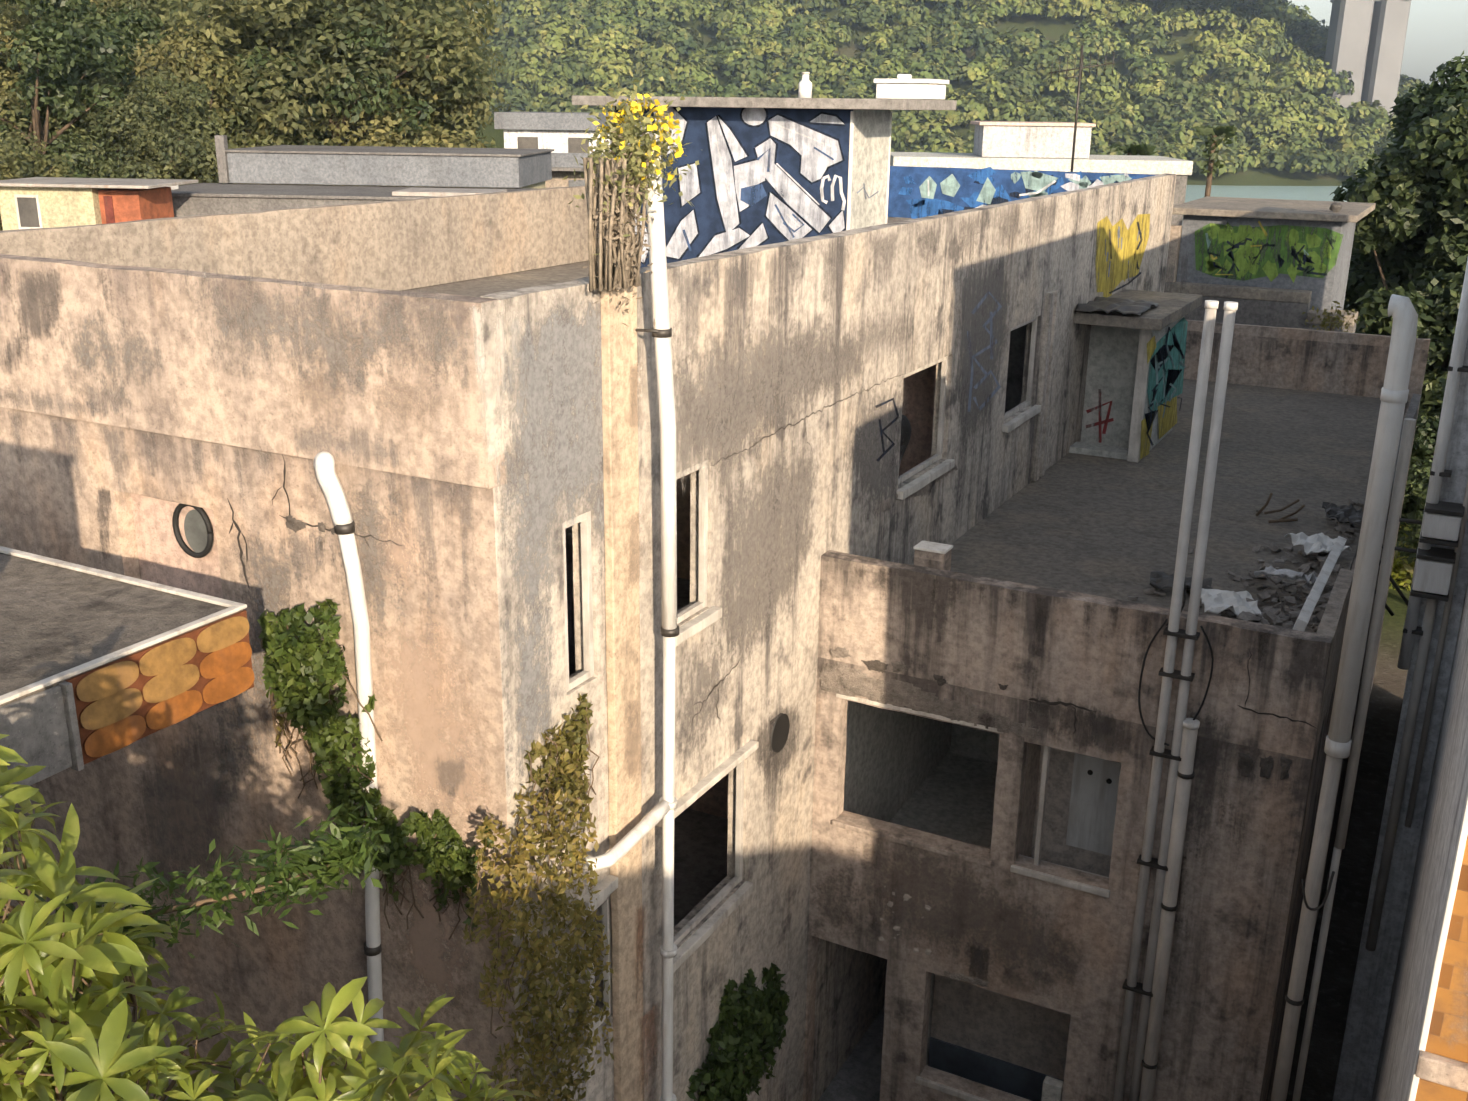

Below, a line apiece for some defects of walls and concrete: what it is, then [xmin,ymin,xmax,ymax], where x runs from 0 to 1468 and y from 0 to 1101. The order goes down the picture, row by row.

water stain [5,338,21,369]
water stain [473,307,520,419]
crack [227,498,250,589]
crack [272,455,403,549]